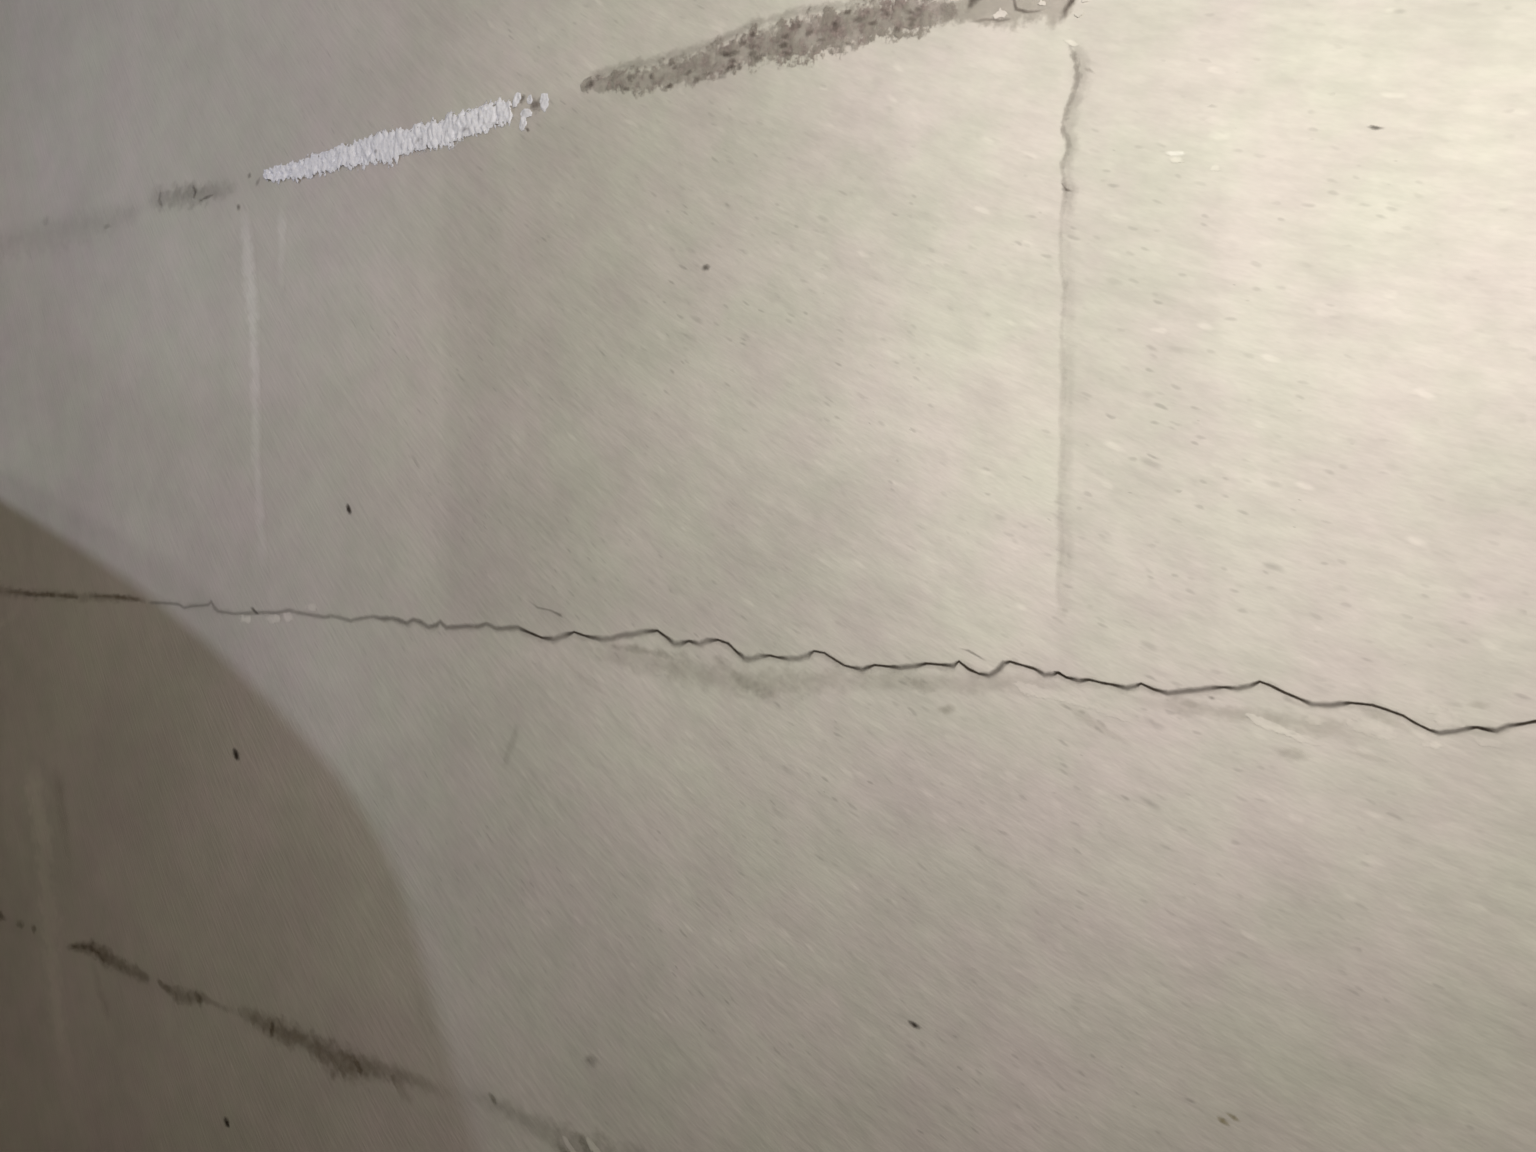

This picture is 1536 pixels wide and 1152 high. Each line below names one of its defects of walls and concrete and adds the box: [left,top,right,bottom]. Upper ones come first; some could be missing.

flaking render [587,0,952,92]
crack [522,629,594,639]
crack [650,630,1165,693]
crack [1213,681,1536,733]